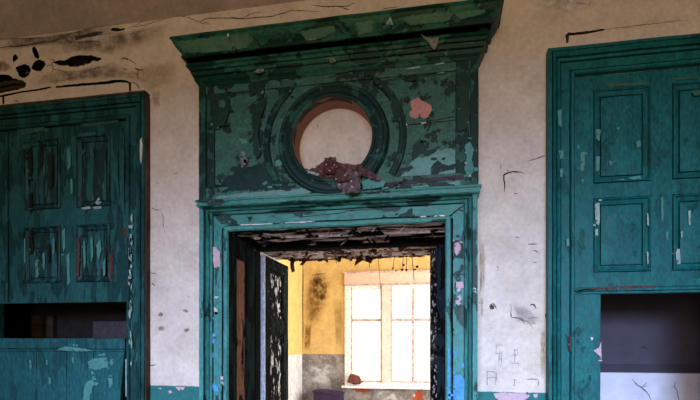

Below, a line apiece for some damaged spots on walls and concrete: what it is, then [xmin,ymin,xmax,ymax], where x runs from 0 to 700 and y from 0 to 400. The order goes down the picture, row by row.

crack [129,3,356,46]
spalling [0,47,102,94]
peeling [364,66,432,126]
peeling [206,69,313,199]
peeling [360,137,479,198]
crack [499,156,543,194]
peeling [212,247,220,269]
peeling [252,208,436,272]
peeling [453,235,465,310]
damp [305,276,326,347]
crack [479,302,546,324]
peeling [58,344,114,400]